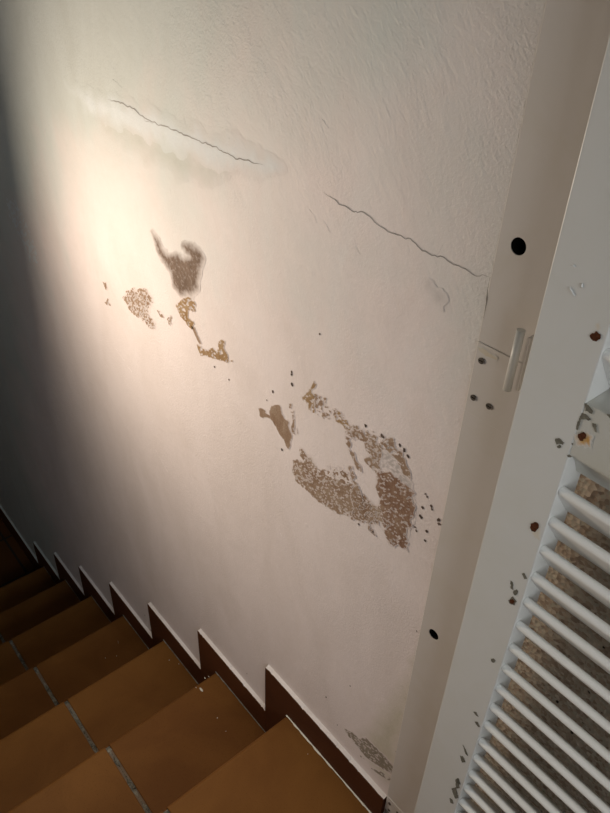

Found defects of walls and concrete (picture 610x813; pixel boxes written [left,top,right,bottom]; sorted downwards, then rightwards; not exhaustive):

crack [108,99,258,164]
leakage [149,228,206,300]
crack [326,194,490,309]
peeling [122,287,233,368]
peeling [258,381,433,552]
peeling [344,728,393,781]